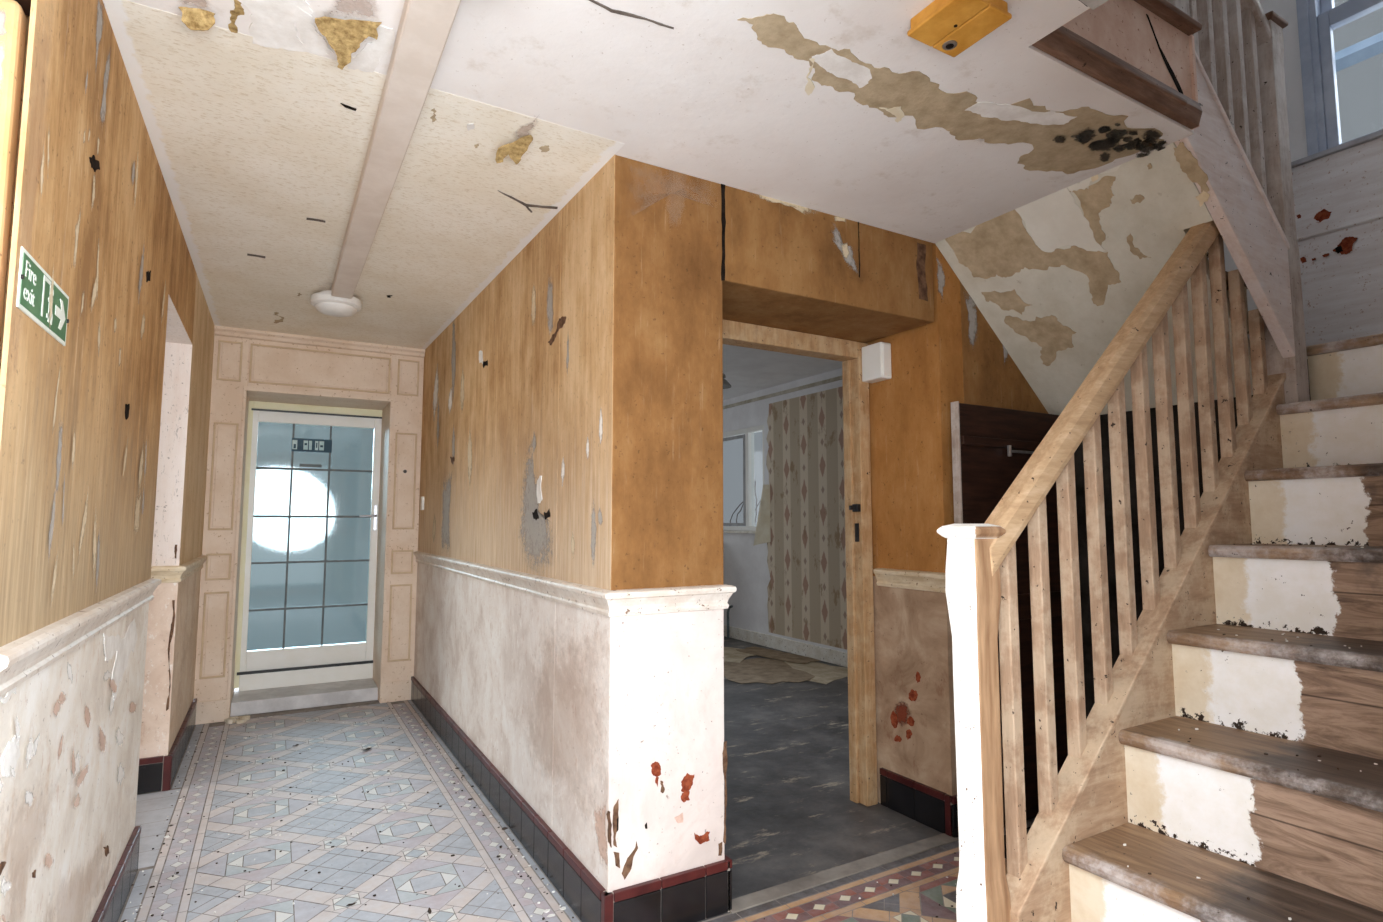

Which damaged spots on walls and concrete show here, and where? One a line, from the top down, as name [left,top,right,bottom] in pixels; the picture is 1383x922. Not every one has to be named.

crack [589,0,674,29]
peeling [179,0,395,73]
peeling [495,123,550,164]
leakage [1053,123,1166,162]
peeling [738,13,1210,366]
corrosion [1297,209,1331,222]
corrosion [1300,237,1358,264]
peeling [521,434,550,563]
corrosion [890,672,921,742]
corrosion [651,761,694,802]
spalling [594,806,612,864]
corrosion [694,831,710,844]